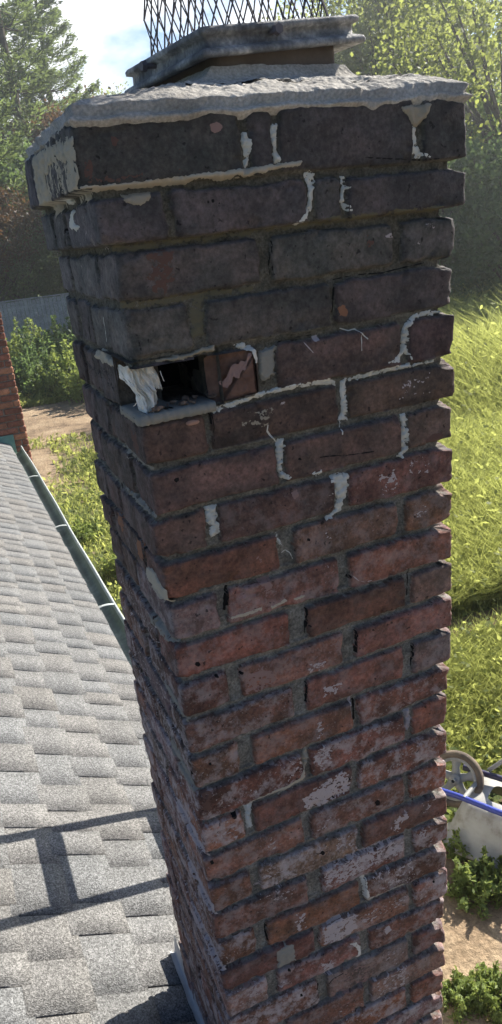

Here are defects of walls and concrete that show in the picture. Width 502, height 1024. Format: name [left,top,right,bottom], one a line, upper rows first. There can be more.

spalling [98,348,258,419]
efflorescence [378,469,398,495]